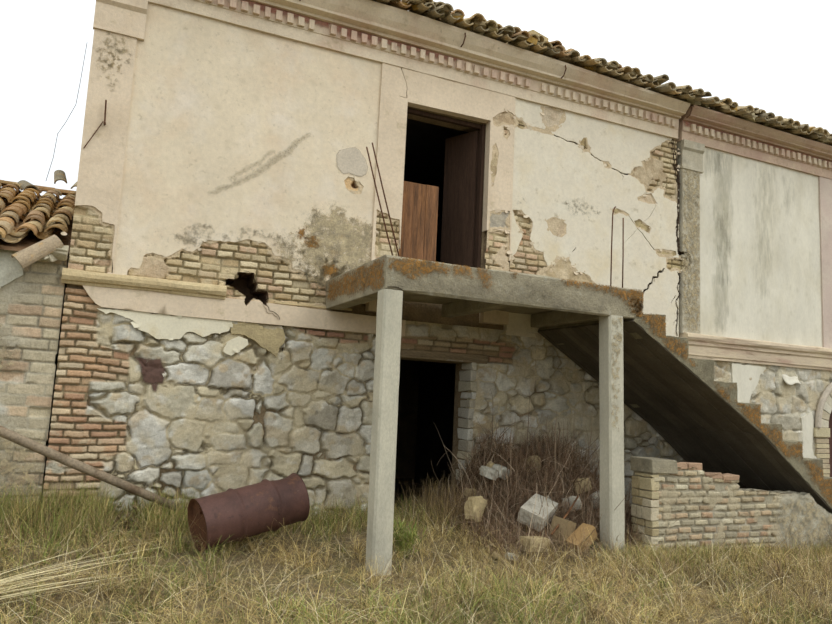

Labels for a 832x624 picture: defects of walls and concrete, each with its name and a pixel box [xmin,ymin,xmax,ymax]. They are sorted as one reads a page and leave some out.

flaking render [493,106,566,139]
flaking render [127,239,331,311]
spalling [344,177,364,194]
flaking render [366,142,400,259]
flaking render [484,209,595,284]
flaking render [610,206,651,288]
flaking render [628,140,681,204]
crack [643,139,686,335]